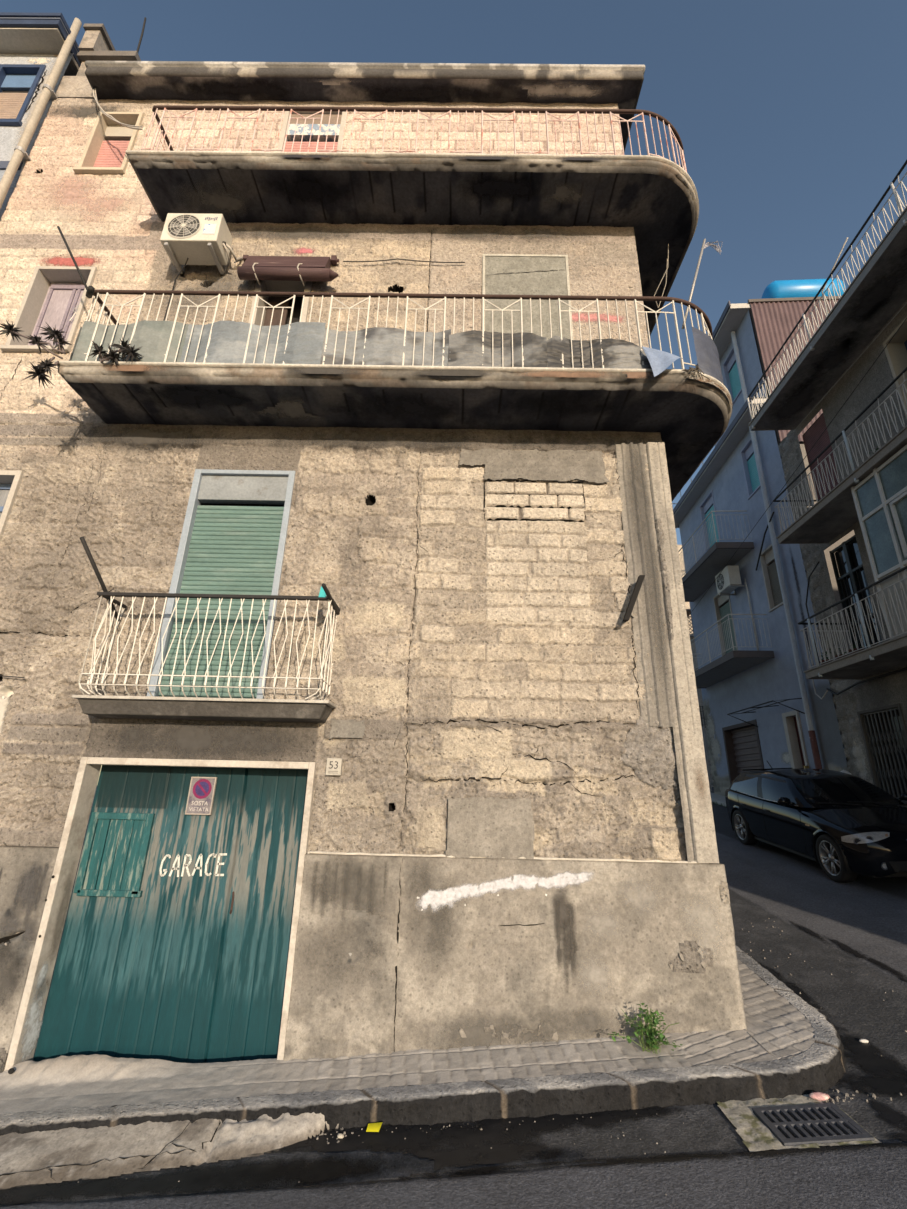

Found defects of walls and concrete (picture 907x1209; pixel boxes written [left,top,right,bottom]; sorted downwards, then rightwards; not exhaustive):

damp [188,185,244,214]
damp [467,177,582,202]
damp [230,226,350,239]
damp [428,227,563,239]
damp [150,387,475,453]
damp [77,425,220,451]
crack [394,448,639,1052]
crack [0,931,25,946]
damp [556,896,608,989]